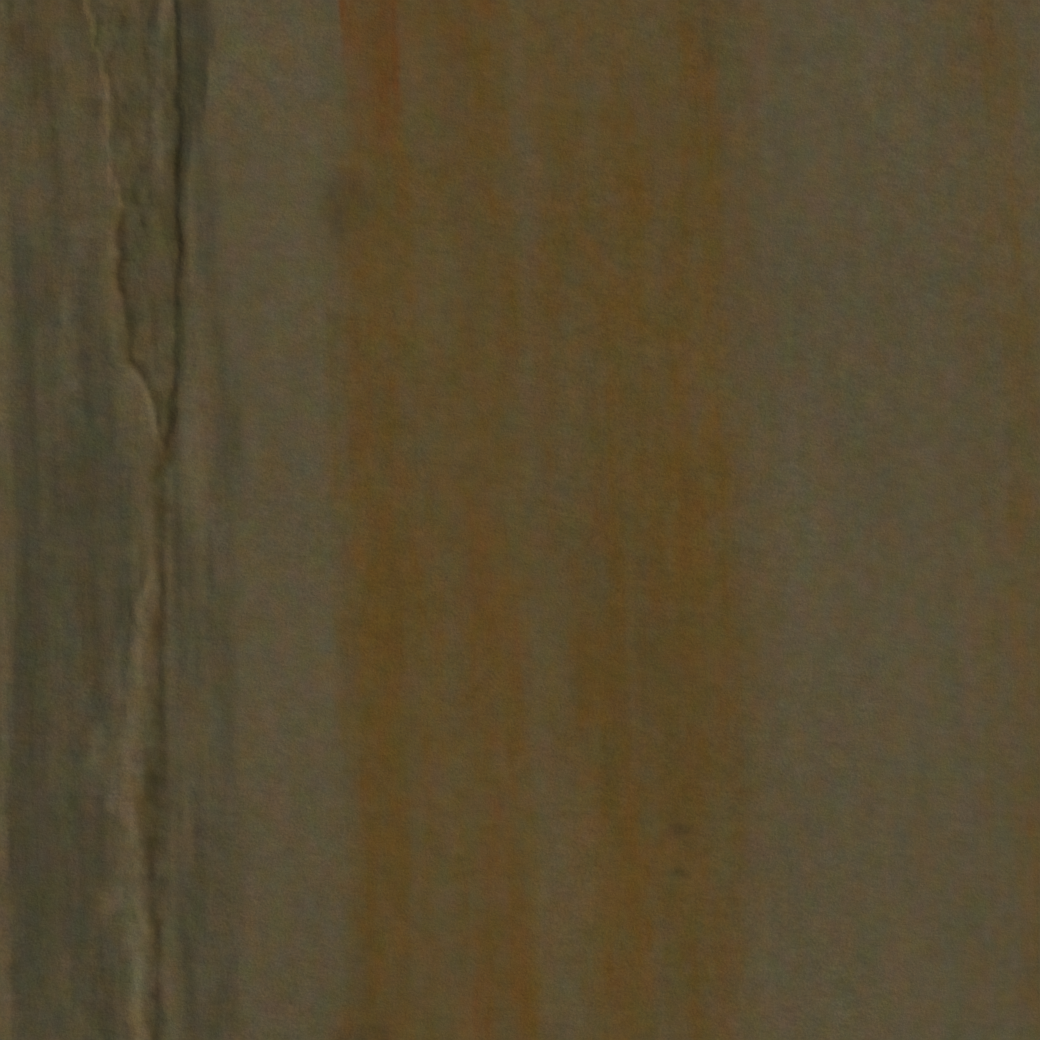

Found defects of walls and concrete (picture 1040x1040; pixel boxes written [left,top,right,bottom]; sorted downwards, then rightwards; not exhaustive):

water stain [0,0,257,1040]